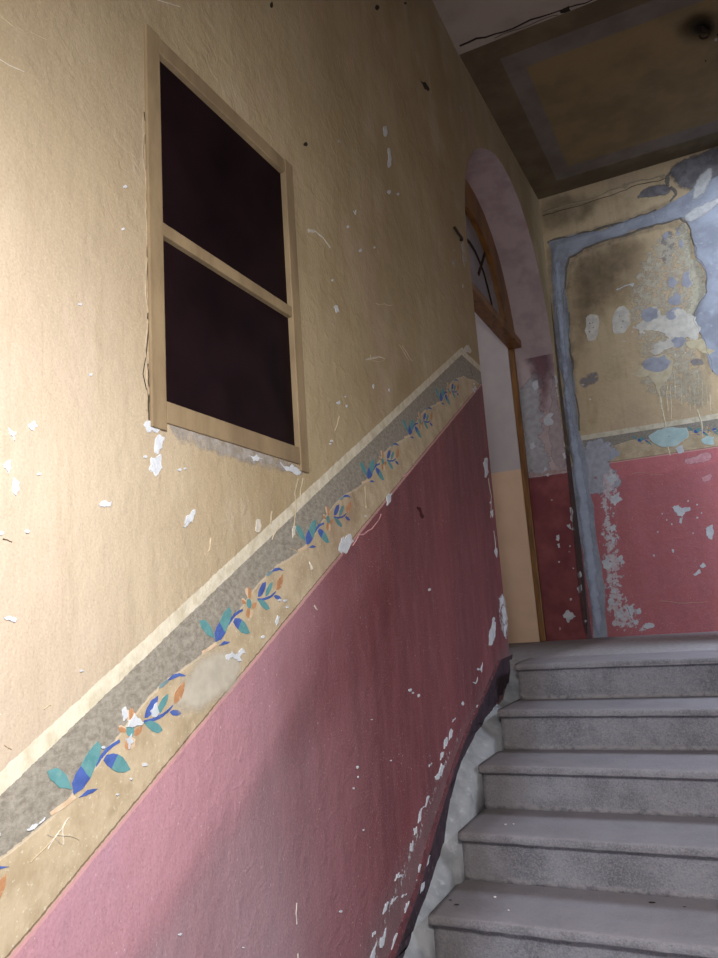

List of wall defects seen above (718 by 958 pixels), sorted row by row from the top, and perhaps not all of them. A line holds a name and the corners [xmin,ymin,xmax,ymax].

crack [459,0,592,47]
peeling [638,184,670,198]
peeling [661,168,718,263]
peeling [631,271,714,454]
peeling [143,420,165,477]
peeling [370,718,461,958]